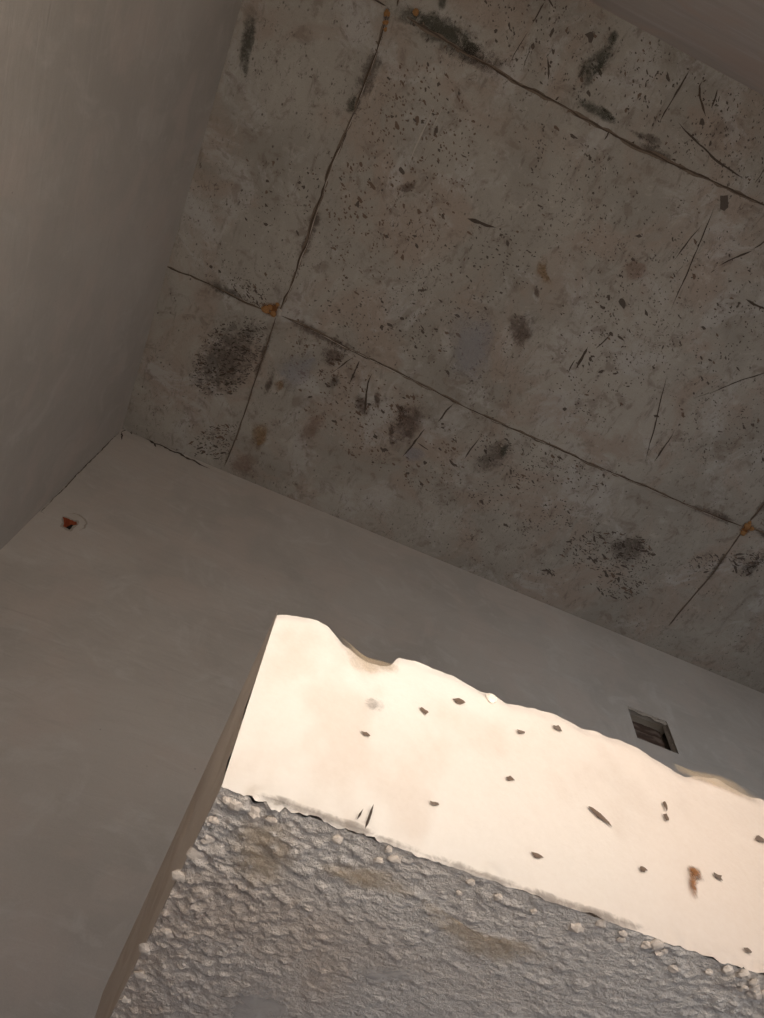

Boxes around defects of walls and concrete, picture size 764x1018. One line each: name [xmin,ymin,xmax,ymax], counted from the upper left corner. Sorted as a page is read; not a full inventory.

leakage [402,0,477,51]
leakage [579,31,617,84]